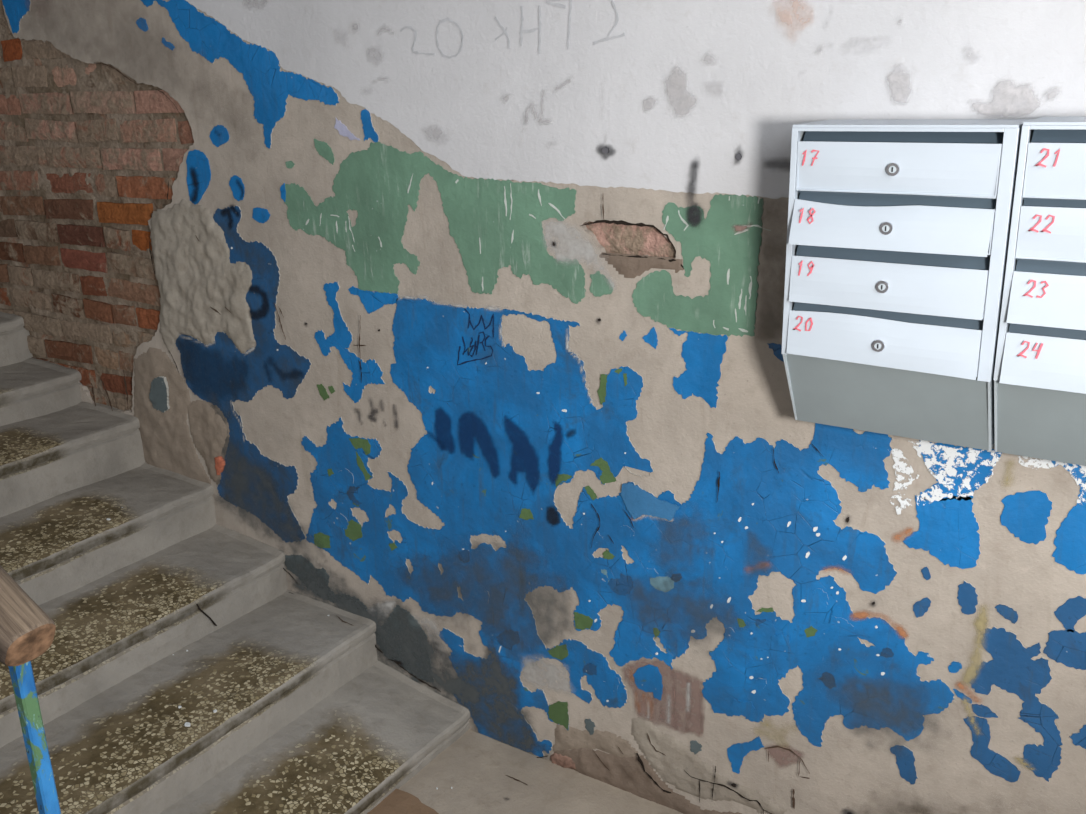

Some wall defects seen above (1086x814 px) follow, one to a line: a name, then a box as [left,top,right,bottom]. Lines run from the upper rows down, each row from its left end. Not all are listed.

flaking render [0,0,340,543]
peeling [280,109,1021,785]
peeling [1000,461,1086,575]
crack [592,733,810,814]
peeling [969,596,1086,782]